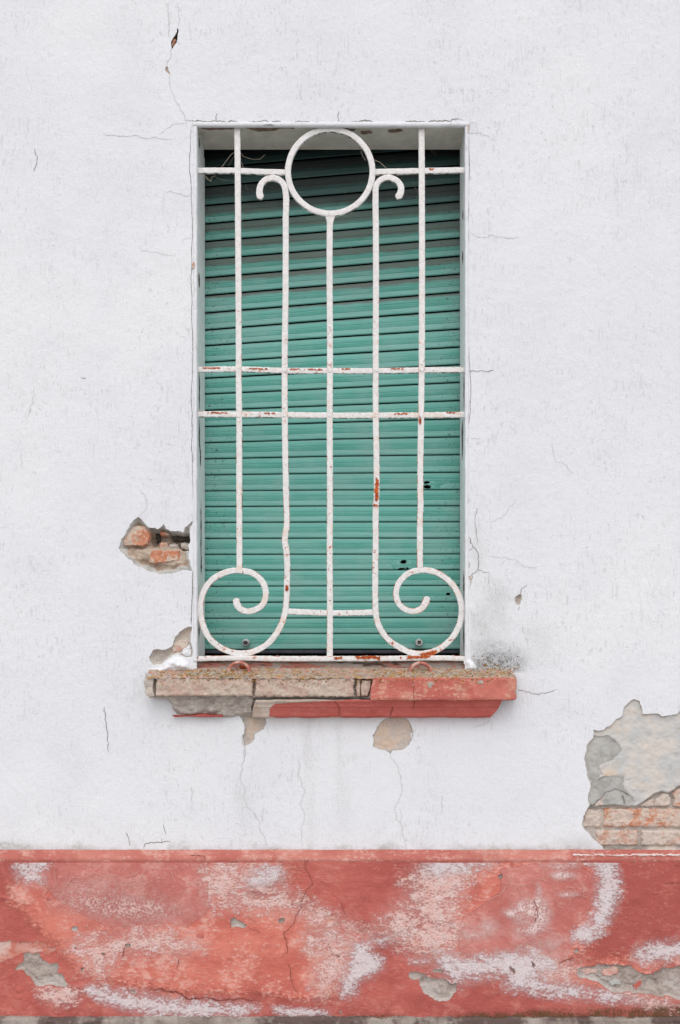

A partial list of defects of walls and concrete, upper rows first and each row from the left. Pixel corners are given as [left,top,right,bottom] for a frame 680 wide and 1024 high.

crack [406,118,488,177]
crack [108,6,309,516]
spalling [119,517,202,574]
spalling [150,626,200,665]
crack [240,735,268,849]
spalling [0,699,680,1019]